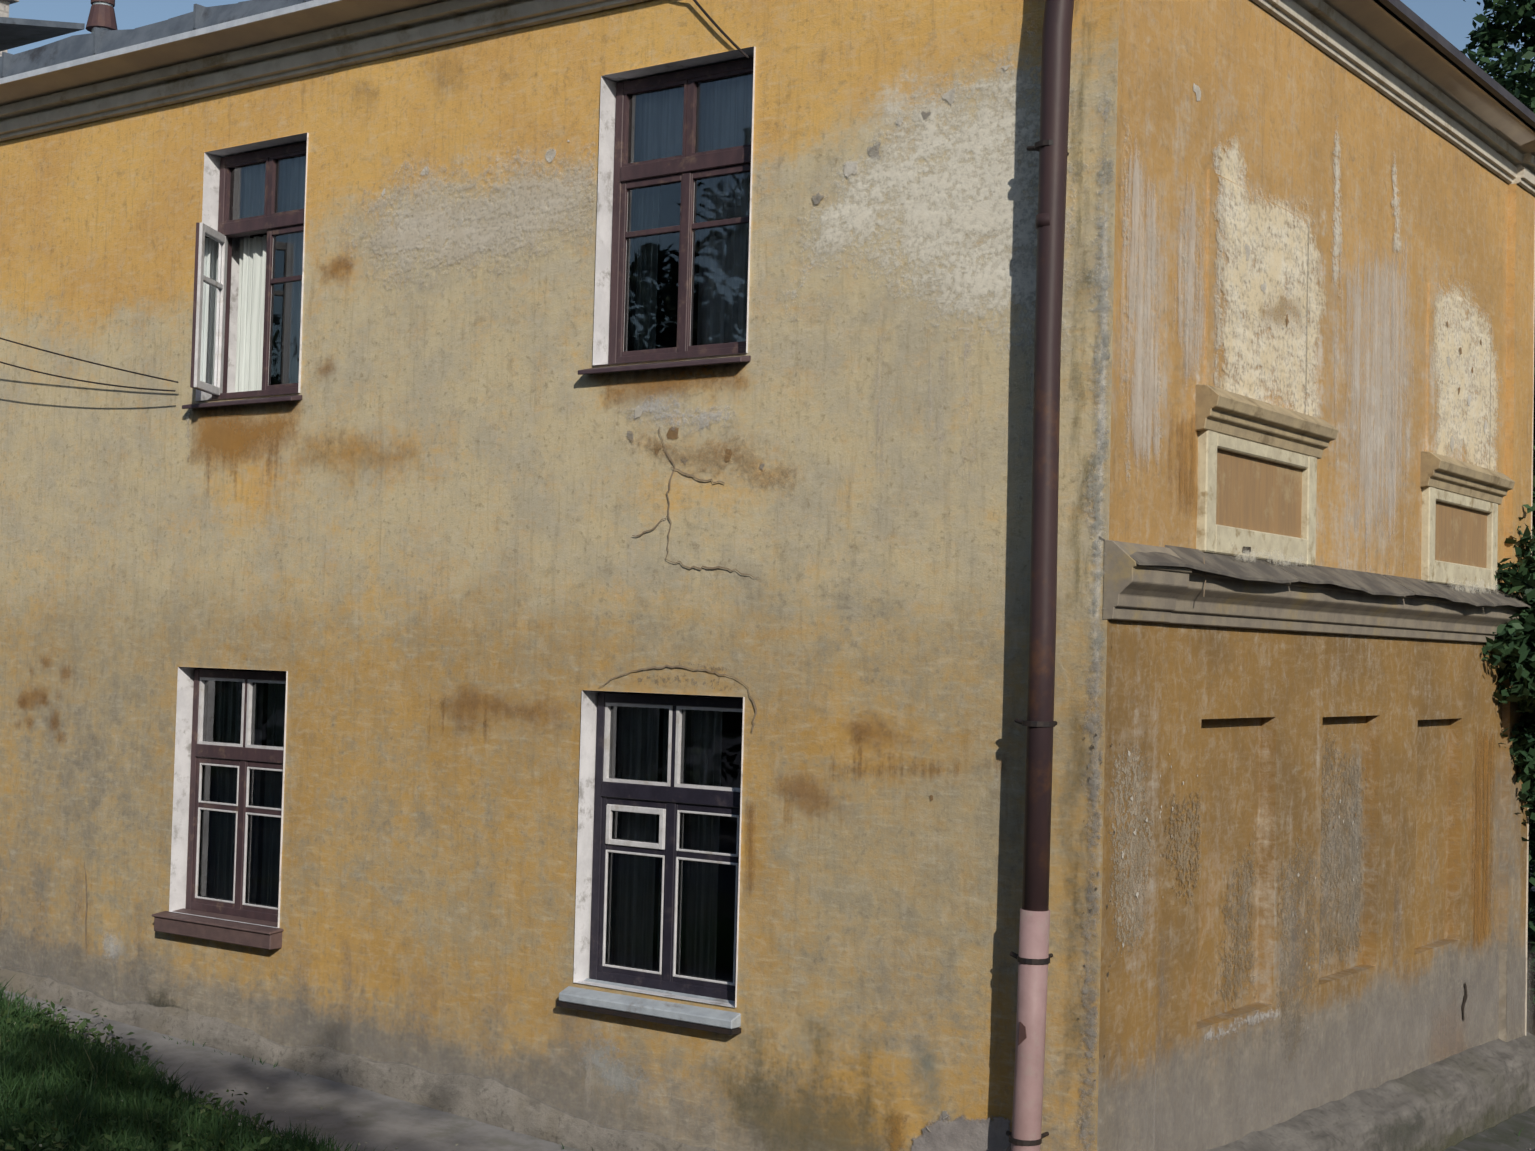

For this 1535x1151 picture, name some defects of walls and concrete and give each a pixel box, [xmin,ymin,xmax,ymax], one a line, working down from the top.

crack [632,427,759,578]
peeling [786,64,1041,347]
peeling [1179,138,1326,417]
peeling [1432,278,1502,471]